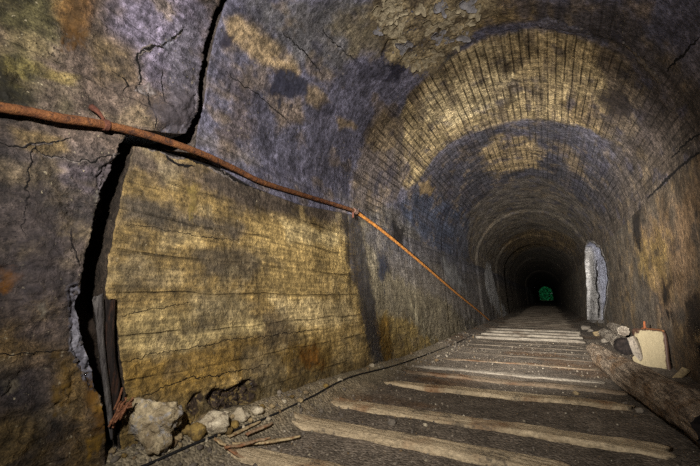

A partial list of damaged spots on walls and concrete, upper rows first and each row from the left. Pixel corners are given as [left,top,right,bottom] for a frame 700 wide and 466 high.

flaking render [370,0,499,77]
crack [667,37,699,72]
crack [647,134,700,198]
crack [0,27,270,396]
damp [342,213,388,364]
crack [122,329,326,362]
spalling [186,378,257,416]